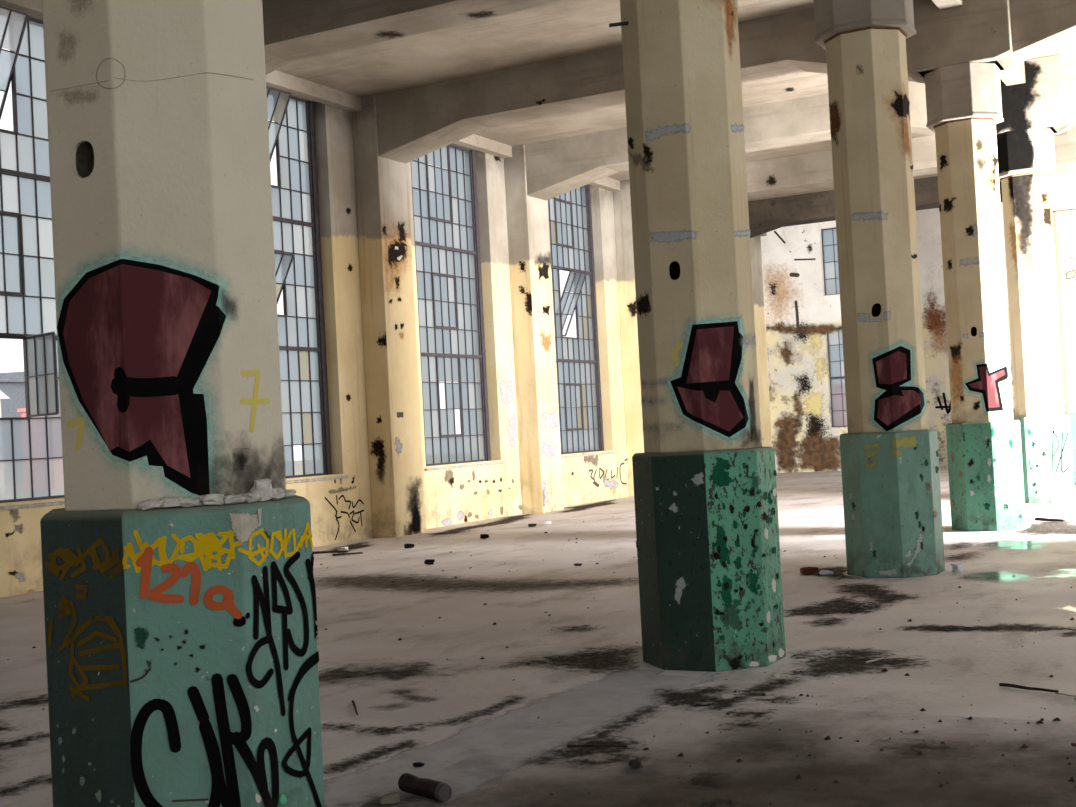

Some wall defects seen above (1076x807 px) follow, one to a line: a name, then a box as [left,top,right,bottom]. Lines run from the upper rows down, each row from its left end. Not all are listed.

corrosion [727,0,738,55]
corrosion [829,101,840,144]
corrosion [891,91,913,170]
corrosion [987,155,998,205]
leakage [1012,175,1035,279]
corrosion [382,221,407,304]
leakage [408,480,420,510]
peeling [691,322,841,626]
peeling [920,451,954,490]
peeling [958,424,1013,510]
peeling [674,577,686,604]
peeling [728,641,785,670]